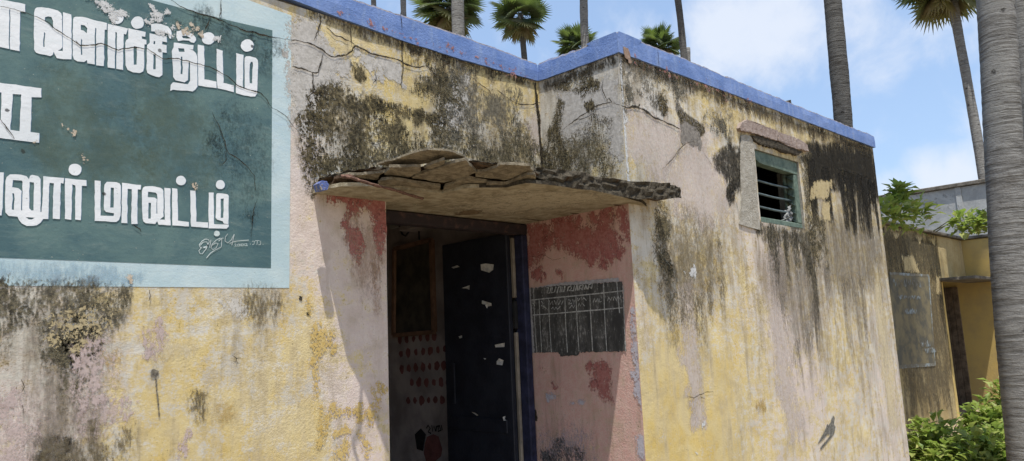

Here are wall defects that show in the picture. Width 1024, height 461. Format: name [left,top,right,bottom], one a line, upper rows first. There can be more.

peeling [95,0,129,25]
peeling [143,3,222,43]
spalling [313,102,541,265]
damp [295,44,734,199]
peeling [527,205,630,283]
crack [558,67,712,168]
peeling [556,46,741,229]
damp [654,200,722,336]
damp [756,124,953,418]
damp [0,267,141,461]
peeling [585,361,615,404]